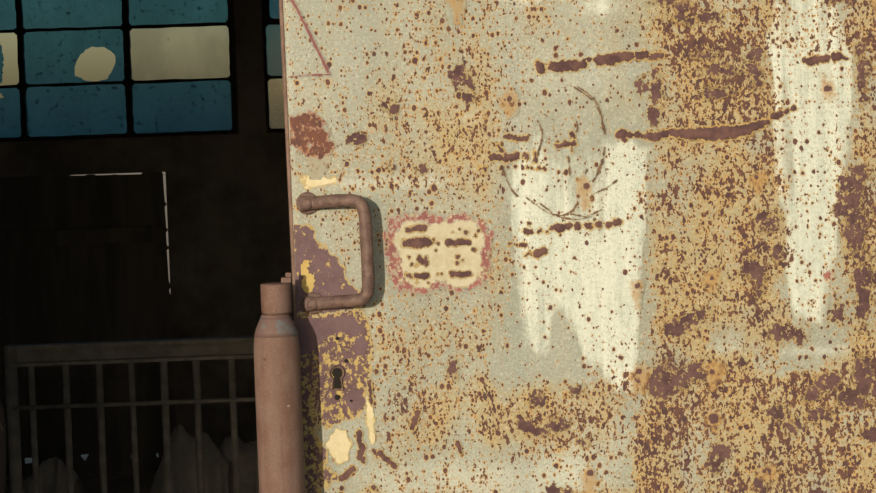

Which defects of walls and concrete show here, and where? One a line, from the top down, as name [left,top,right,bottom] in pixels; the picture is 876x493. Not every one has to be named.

rust [532,46,800,144]
rust [800,41,873,111]
rust [289,110,371,180]
rust [476,131,548,175]
rust [507,172,625,260]
rust [826,161,876,337]
peeling [294,223,399,493]
rust [513,388,593,450]
rust [628,358,708,402]
rust [766,320,808,350]
rust [761,351,876,438]
rust [540,461,600,493]